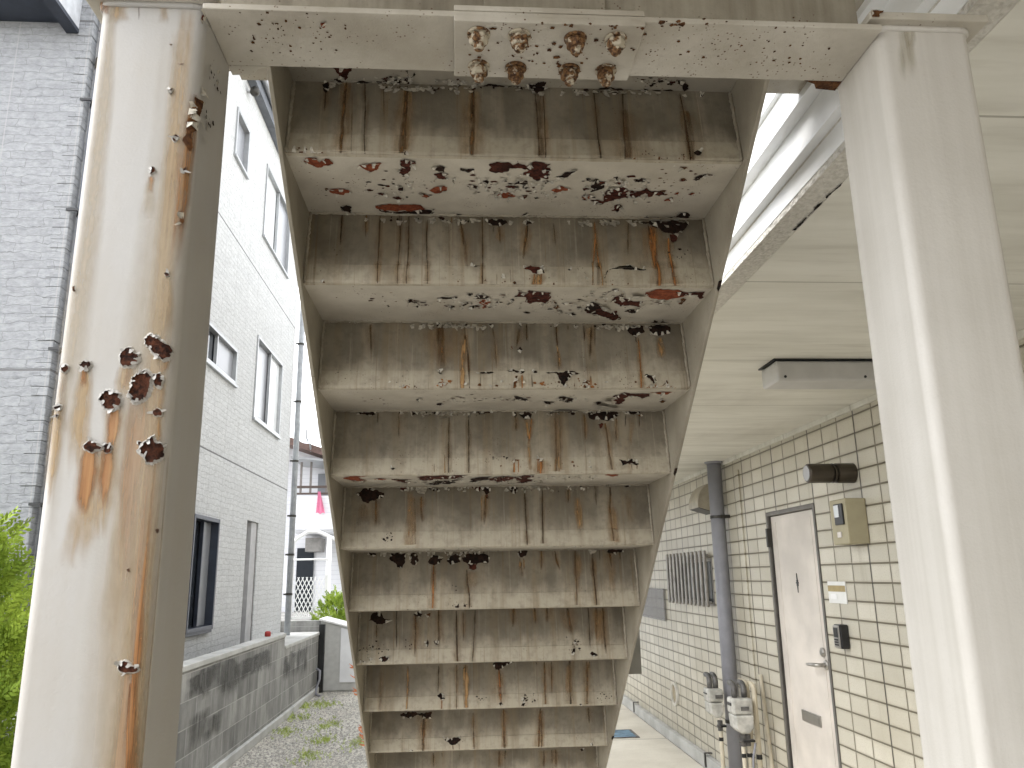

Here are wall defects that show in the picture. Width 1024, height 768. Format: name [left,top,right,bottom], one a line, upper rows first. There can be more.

peeling [182,66,221,151]
rust [399,86,408,153]
peeling [292,146,712,259]
peeling [353,265,704,337]
rust [48,44,196,768]
peeling [388,368,675,429]
rust [513,419,559,473]
peeling [367,532,490,570]
peeling [369,611,392,624]
rust [567,551,620,647]
rust [456,613,475,743]
rust [536,662,556,765]